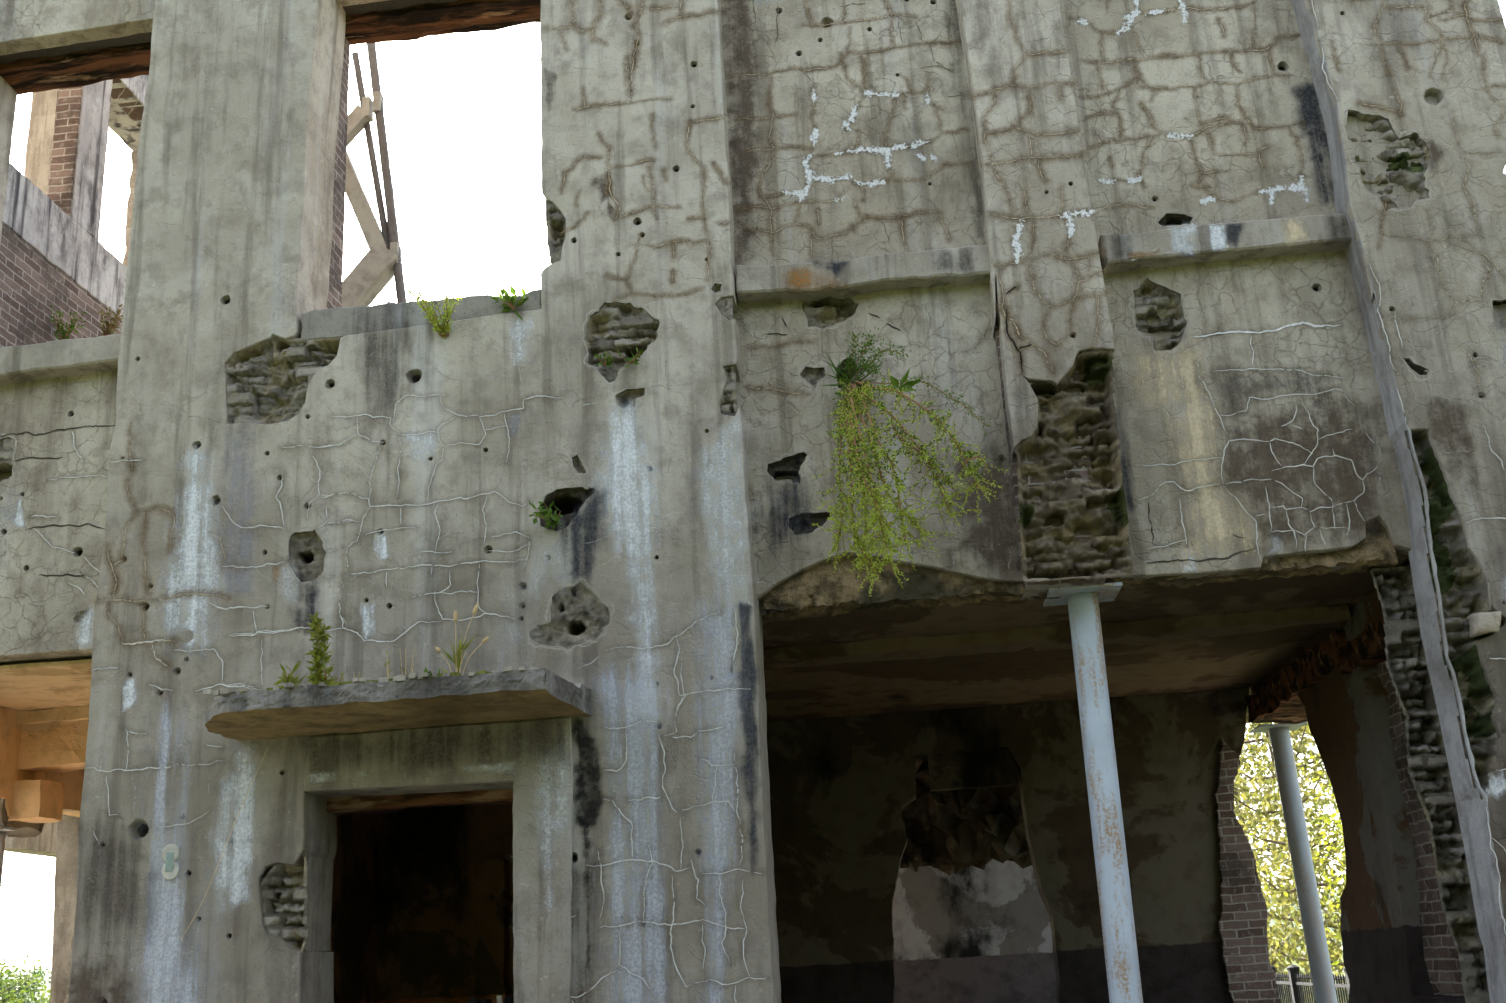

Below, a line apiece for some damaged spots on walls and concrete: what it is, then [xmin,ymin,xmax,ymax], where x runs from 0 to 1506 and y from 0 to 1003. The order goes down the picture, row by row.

spalling [1341,107,1433,213]
spalling [226,335,340,425]
spalling [582,298,663,412]
spalling [1128,275,1190,354]
spalling [0,433,17,484]
crack [543,0,1506,934]
spalling [1014,350,1133,583]
crack [2,331,598,841]
spalling [527,577,616,653]
leakage [386,407,665,1003]
crack [570,574,765,1003]
spalling [260,850,308,954]